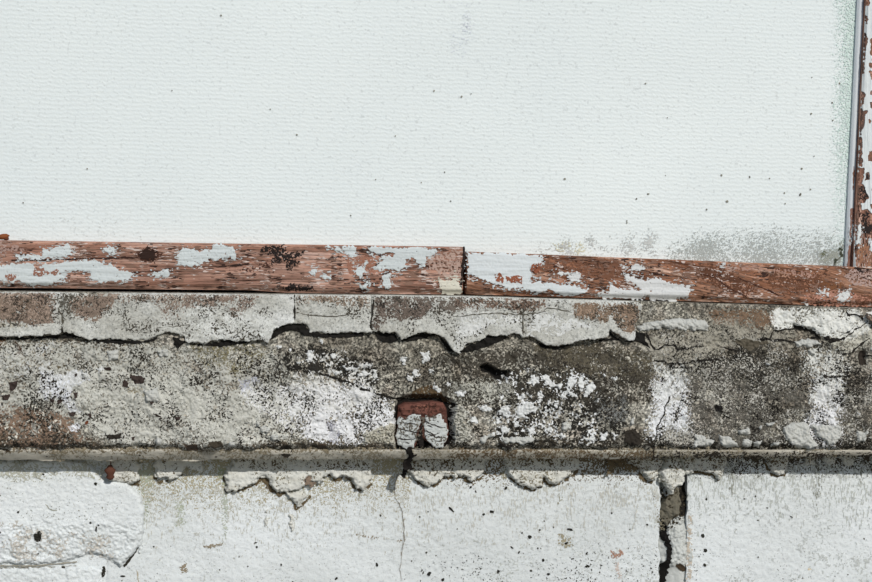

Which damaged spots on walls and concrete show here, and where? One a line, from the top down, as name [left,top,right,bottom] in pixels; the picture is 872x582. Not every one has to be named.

peeling [847,91,872,267]
peeling [33,267,59,277]
peeling [495,262,542,284]
peeling [68,293,259,322]
peeling [296,295,434,331]
peeling [450,297,547,313]
peeling [570,301,639,339]
spalling [793,325,830,340]
crack [827,312,872,378]
crack [319,372,456,574]
damp [110,402,872,582]
crack [659,475,686,582]